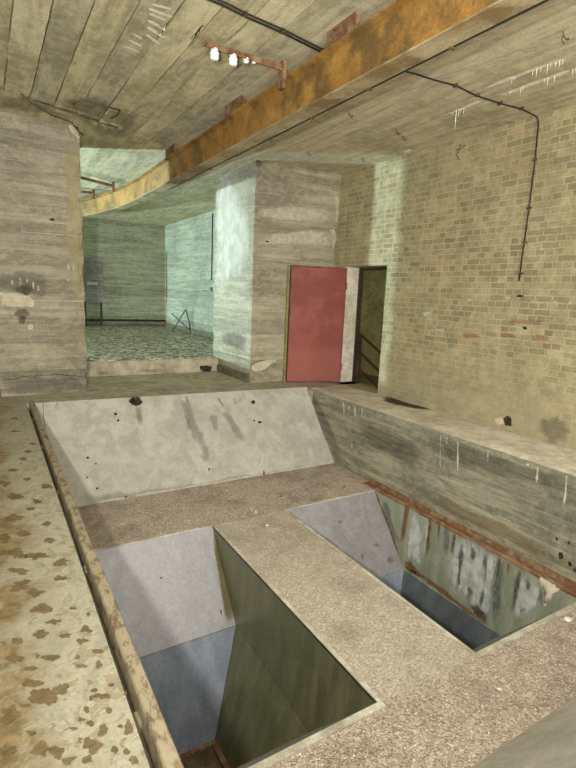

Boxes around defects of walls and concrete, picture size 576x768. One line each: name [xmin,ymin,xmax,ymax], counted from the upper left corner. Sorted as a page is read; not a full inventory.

efflorescence [121,4,174,53]
peeling [0,292,35,307]
spalling [251,358,277,372]
corrosion [376,495,409,550]
corrosion [405,562,486,622]
peeling [539,577,560,607]